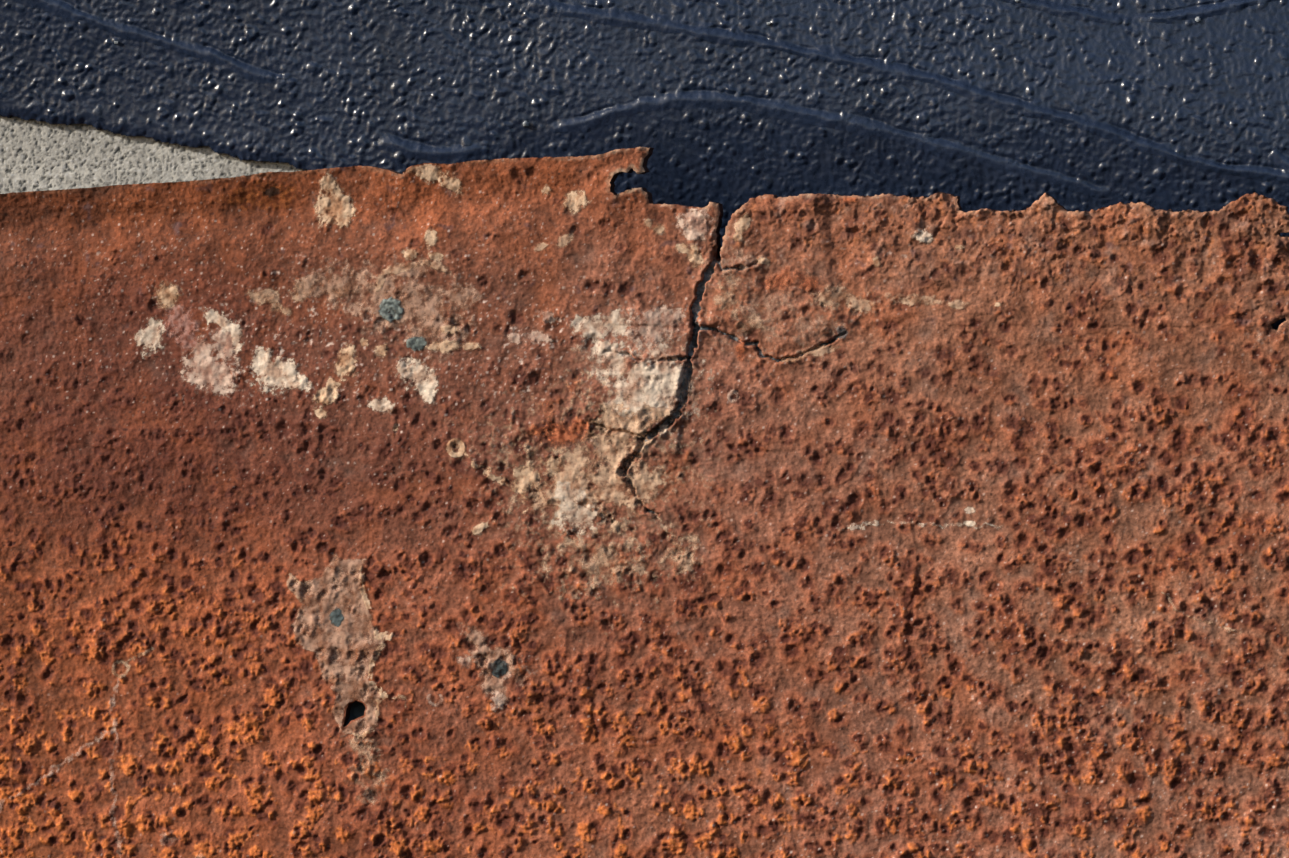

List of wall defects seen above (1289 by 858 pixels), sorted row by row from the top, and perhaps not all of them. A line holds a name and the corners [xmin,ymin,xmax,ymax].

rust [224,184,294,209]
peeling [314,174,356,228]
rust [765,268,788,289]
rust [789,271,817,291]
peeling [264,260,481,354]
crack [598,257,844,514]
rust [529,416,589,444]
rust [330,650,349,682]
peeling [286,554,406,802]
peeling [458,627,519,712]
rust [346,701,366,726]